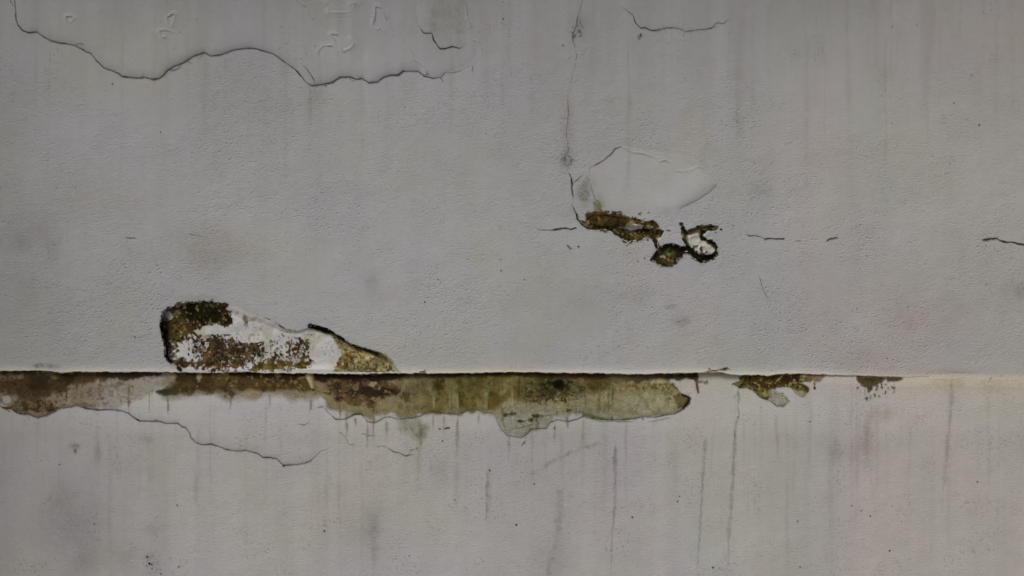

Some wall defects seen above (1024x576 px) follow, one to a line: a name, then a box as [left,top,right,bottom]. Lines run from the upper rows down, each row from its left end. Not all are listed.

crack [10,0,473,85]
crack [627,10,725,32]
crack [539,99,619,230]
spalling [575,209,720,269]
spalling [158,299,400,373]
peeling [0,395,19,413]
leakage [0,371,162,417]
peeling [35,392,430,465]
leakage [310,373,428,445]
peeling [485,396,680,438]
leakage [856,376,903,400]